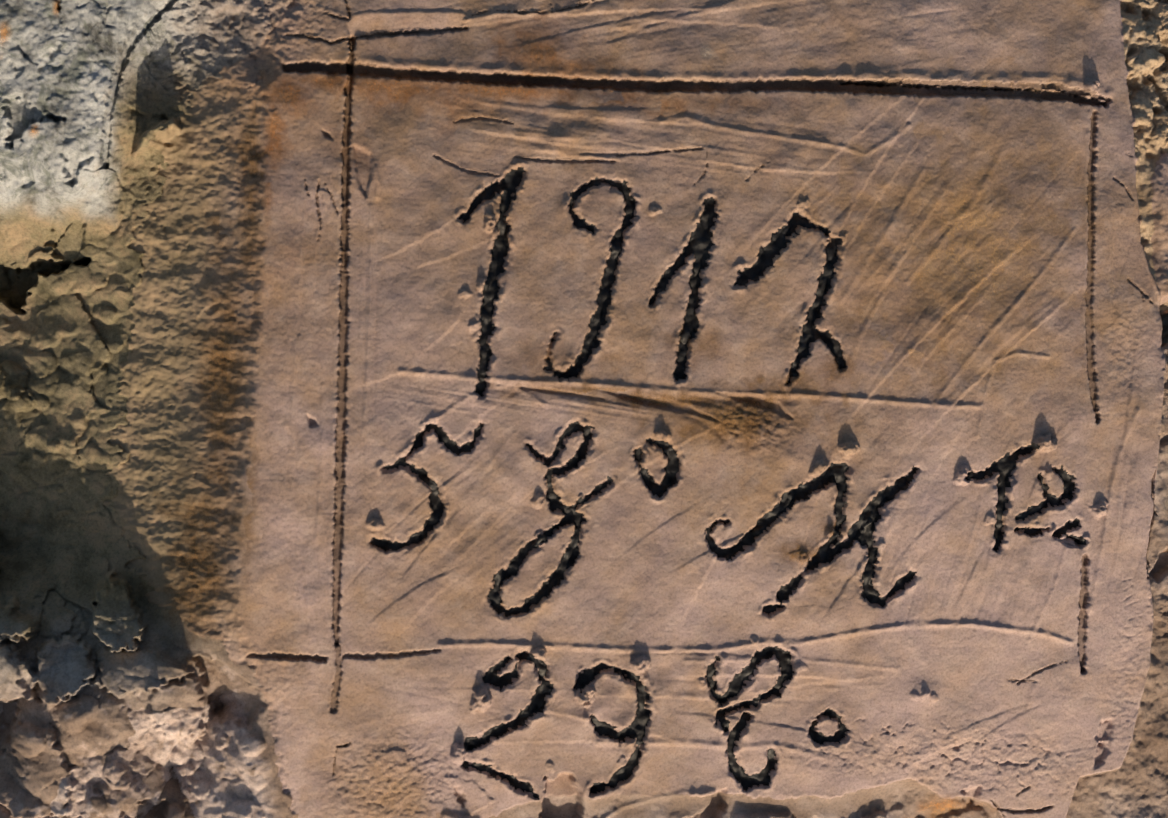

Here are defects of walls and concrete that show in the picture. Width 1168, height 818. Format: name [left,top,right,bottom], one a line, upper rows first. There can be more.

spalling [1113,0,1168,286]